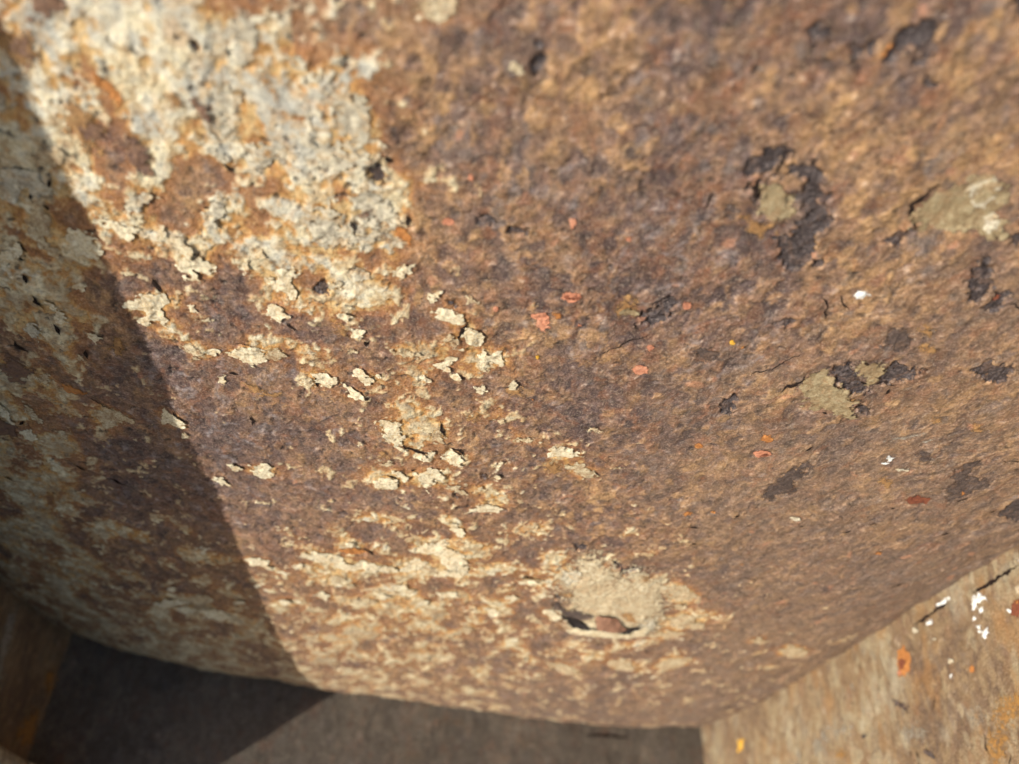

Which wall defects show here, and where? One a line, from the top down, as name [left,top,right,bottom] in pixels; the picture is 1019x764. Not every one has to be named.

corrosion [0,0,65,74]
corrosion [62,102,155,177]
corrosion [167,92,214,124]
peeling [200,54,410,252]
spalling [725,144,835,272]
peeling [157,226,217,282]
peeling [389,291,505,381]
corrosion [531,312,561,331]
corrosion [632,365,649,375]
peeling [370,420,504,499]
peeling [292,523,471,589]
corrosion [897,645,911,678]